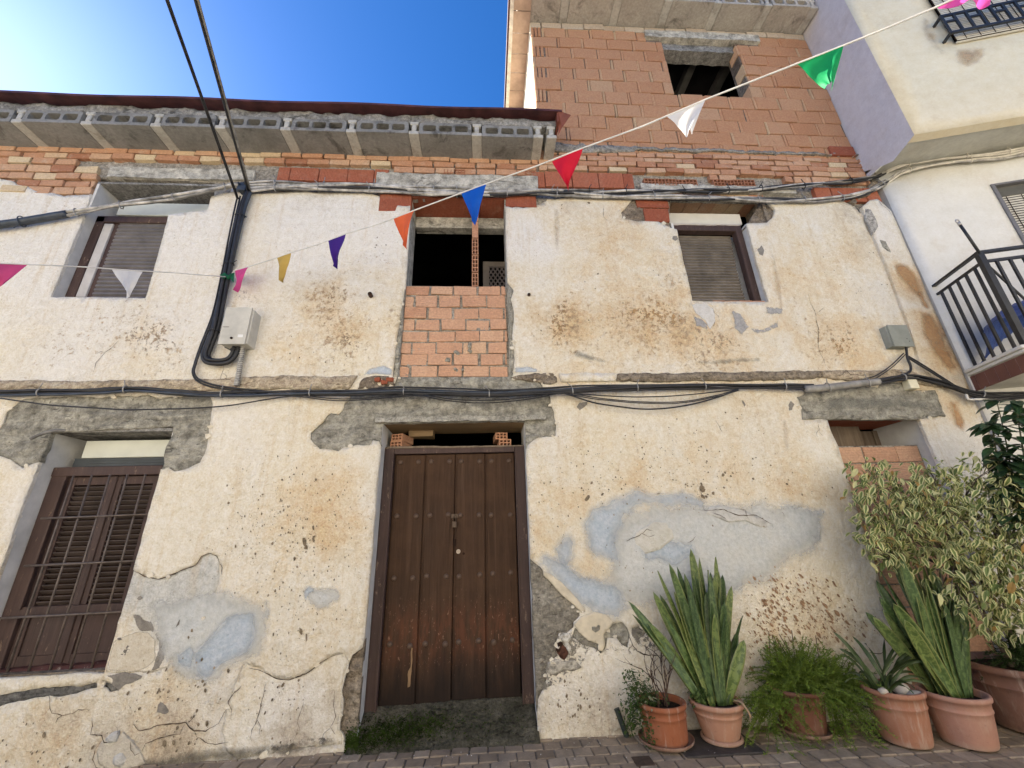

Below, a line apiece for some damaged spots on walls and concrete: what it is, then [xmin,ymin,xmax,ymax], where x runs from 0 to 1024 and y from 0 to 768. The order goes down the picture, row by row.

peeling [692,303,782,344]
crack [702,506,784,525]
peeling [0,554,367,760]
crack [49,654,340,768]
peeling [530,492,820,711]